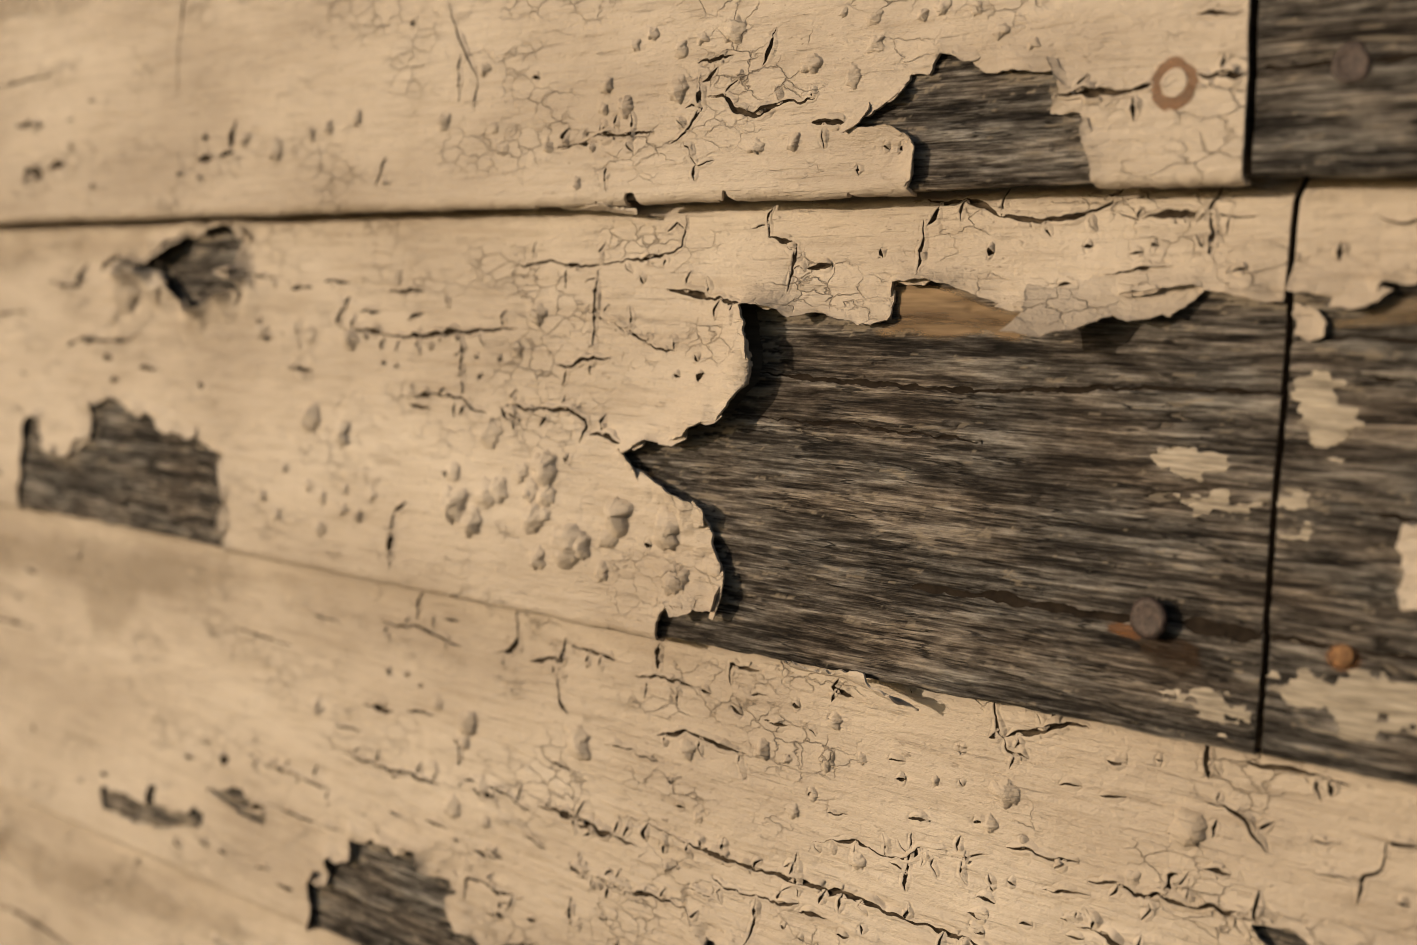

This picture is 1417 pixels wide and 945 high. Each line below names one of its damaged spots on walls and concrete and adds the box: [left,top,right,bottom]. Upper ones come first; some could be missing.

peeling [838,28,1125,197]
crack [1051,73,1154,122]
rust [1151,57,1200,110]
peeling [1252,0,1417,178]
crack [913,187,1261,288]
peeling [0,350,241,555]
peeling [614,236,1417,787]
rust [1109,623,1140,639]
peeling [254,782,509,945]
crack [247,745,1265,945]
crack [989,702,1092,770]
crack [1198,744,1350,854]